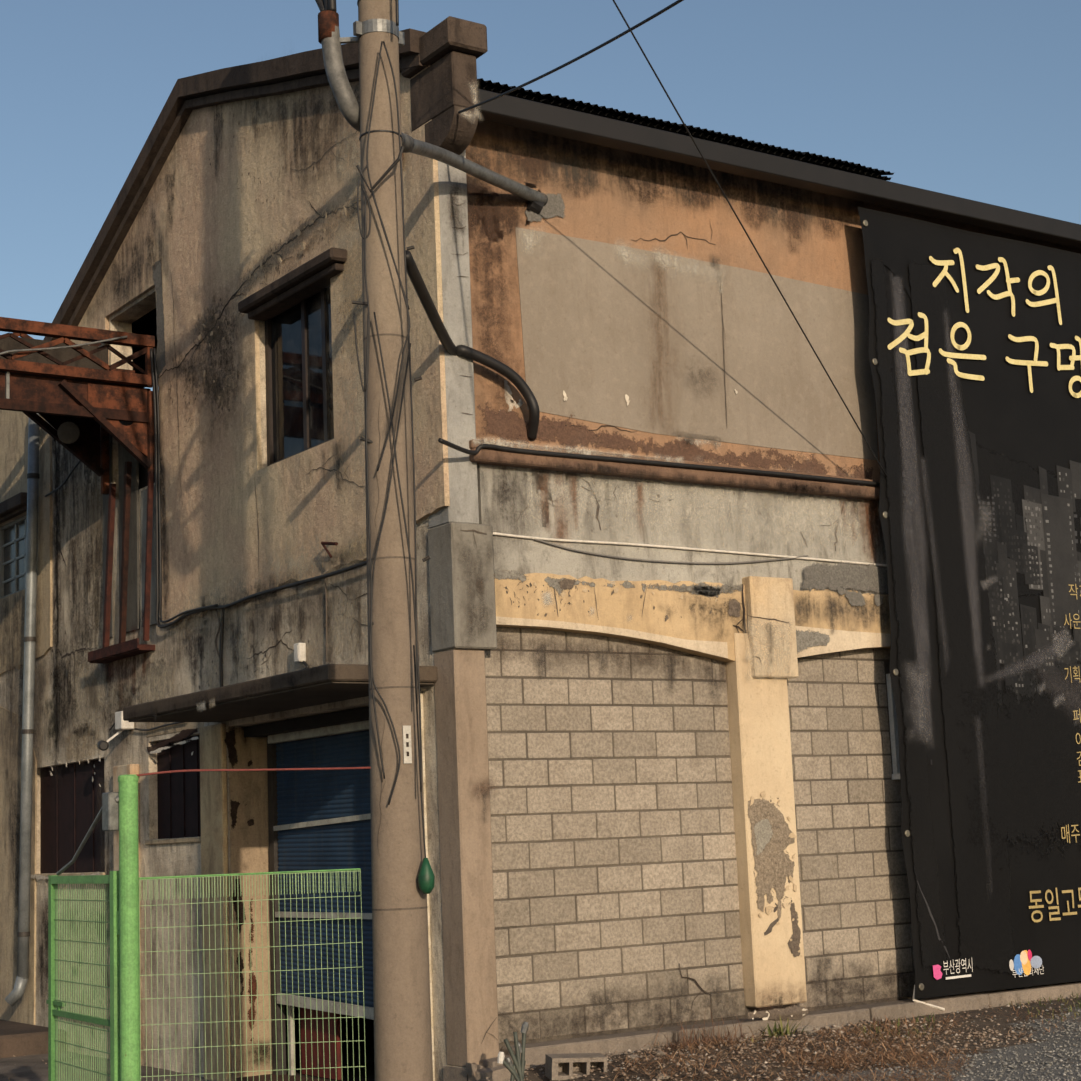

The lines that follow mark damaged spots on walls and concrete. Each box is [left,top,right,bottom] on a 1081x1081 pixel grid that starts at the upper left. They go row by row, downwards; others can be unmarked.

crack [158,200,361,437]
damp [470,135,840,414]
crack [633,225,716,249]
crack [309,403,380,526]
spalling [474,380,873,486]
corrosion [863,502,878,549]
damp [1,439,163,779]
crack [247,630,294,665]
peeling [494,569,742,618]
peeling [747,791,801,957]
damp [40,914,48,1004]